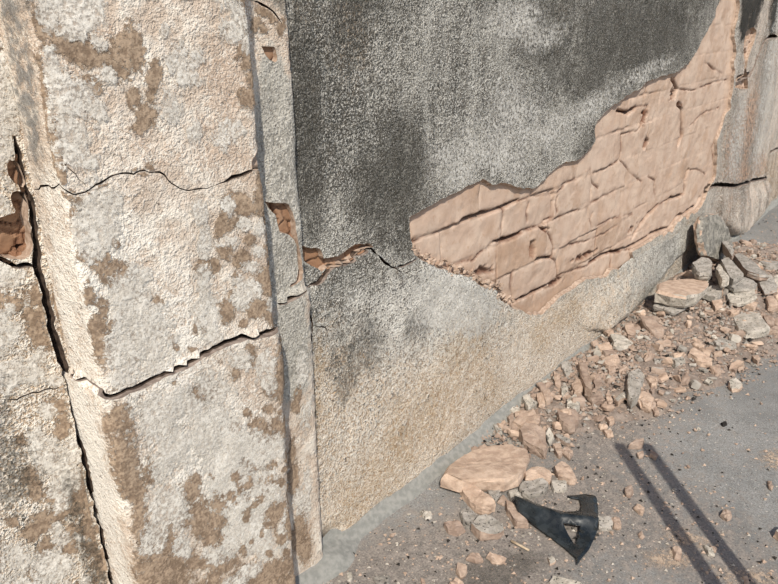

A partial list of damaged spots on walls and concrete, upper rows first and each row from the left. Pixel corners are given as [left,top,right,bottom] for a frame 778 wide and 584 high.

spalling [0,41,107,584]
crack [1,136,278,403]
peeling [30,0,373,584]
crack [250,0,282,23]
leakage [289,39,319,235]
leakage [355,0,698,247]
spalling [409,0,769,316]
crack [704,176,767,191]
leakage [729,0,778,189]
crack [736,34,777,82]
crack [76,433,113,584]